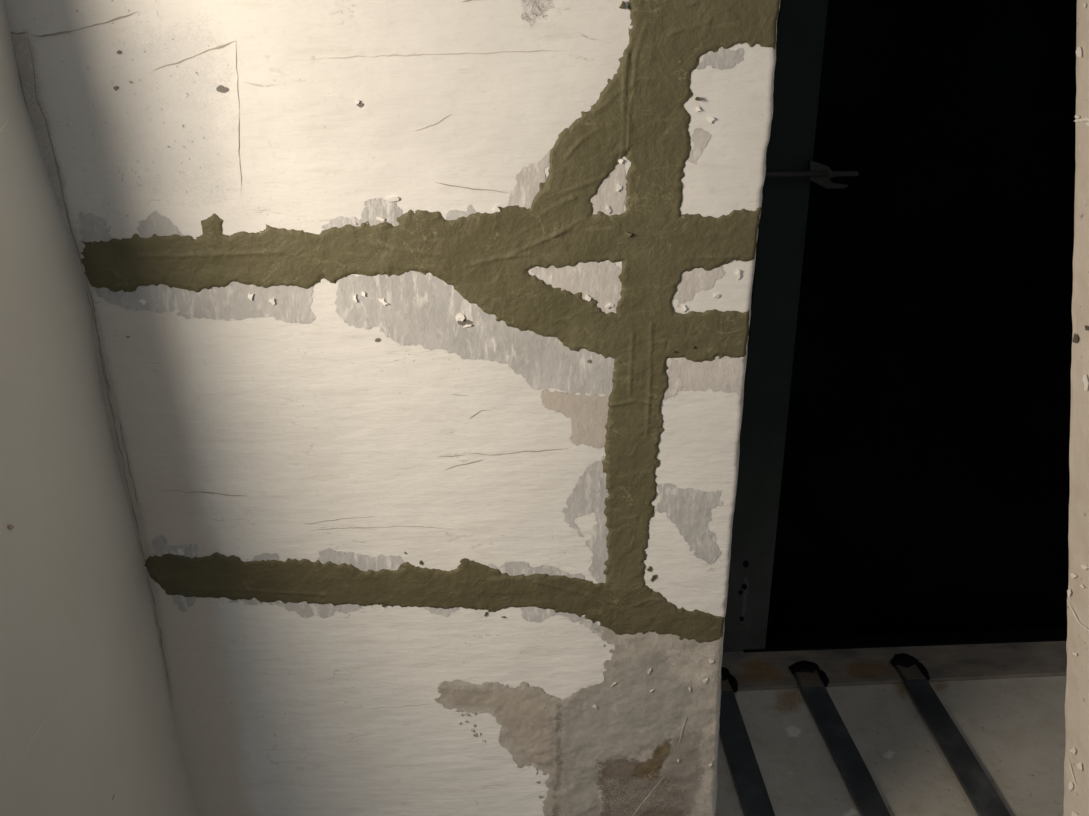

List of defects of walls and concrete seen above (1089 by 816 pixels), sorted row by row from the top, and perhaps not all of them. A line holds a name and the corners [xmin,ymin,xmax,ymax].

crack [310,50,551,60]
peeling [321,197,402,230]
peeling [445,205,475,220]
crack [434,182,502,192]
peeling [530,260,622,313]
crack [10,11,243,708]
peeling [335,271,615,583]
crack [440,448,568,470]
crack [305,516,446,531]
peeling [655,483,724,565]
flaking render [435,606,722,816]
damp [595,729,705,816]